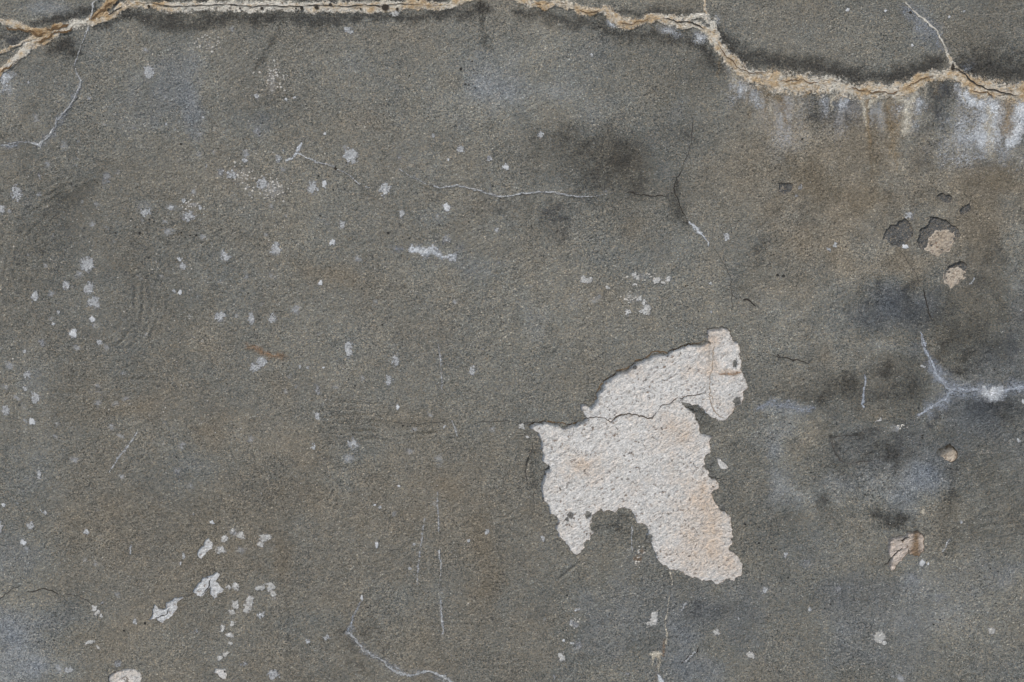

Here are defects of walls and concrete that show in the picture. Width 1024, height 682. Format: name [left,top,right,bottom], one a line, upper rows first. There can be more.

crack [0,0,474,148]
crack [515,0,1024,106]
leakage [515,8,1024,173]
crack [399,115,756,310]
spalling [882,193,971,288]
crack [900,251,1024,416]
flaking render [519,326,748,585]
spalling [936,444,958,463]
spalling [883,530,929,571]